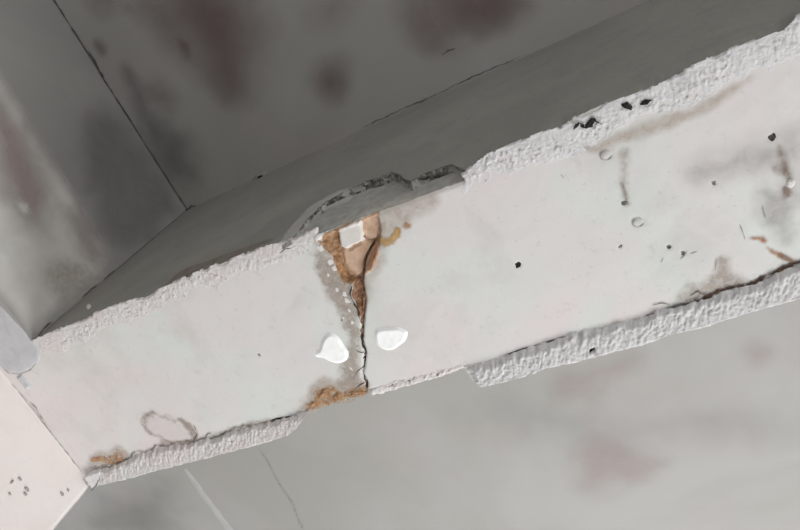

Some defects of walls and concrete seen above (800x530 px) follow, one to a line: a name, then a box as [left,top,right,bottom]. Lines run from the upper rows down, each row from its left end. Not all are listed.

rust [379,223,410,246]
spalling [280,164,465,388]
crack [647,261,800,316]
crack [350,316,368,392]
rust [306,382,368,409]
rust [91,449,128,467]